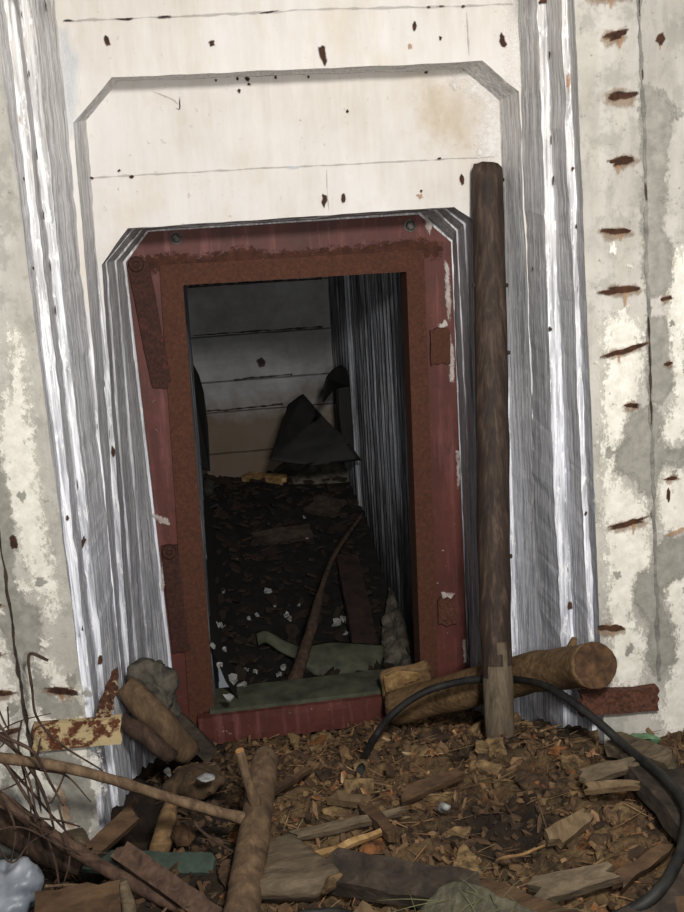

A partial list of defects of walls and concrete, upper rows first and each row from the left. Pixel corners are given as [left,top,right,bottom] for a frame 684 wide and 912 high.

rust [140,236,443,274]
rust [95,667,119,718]